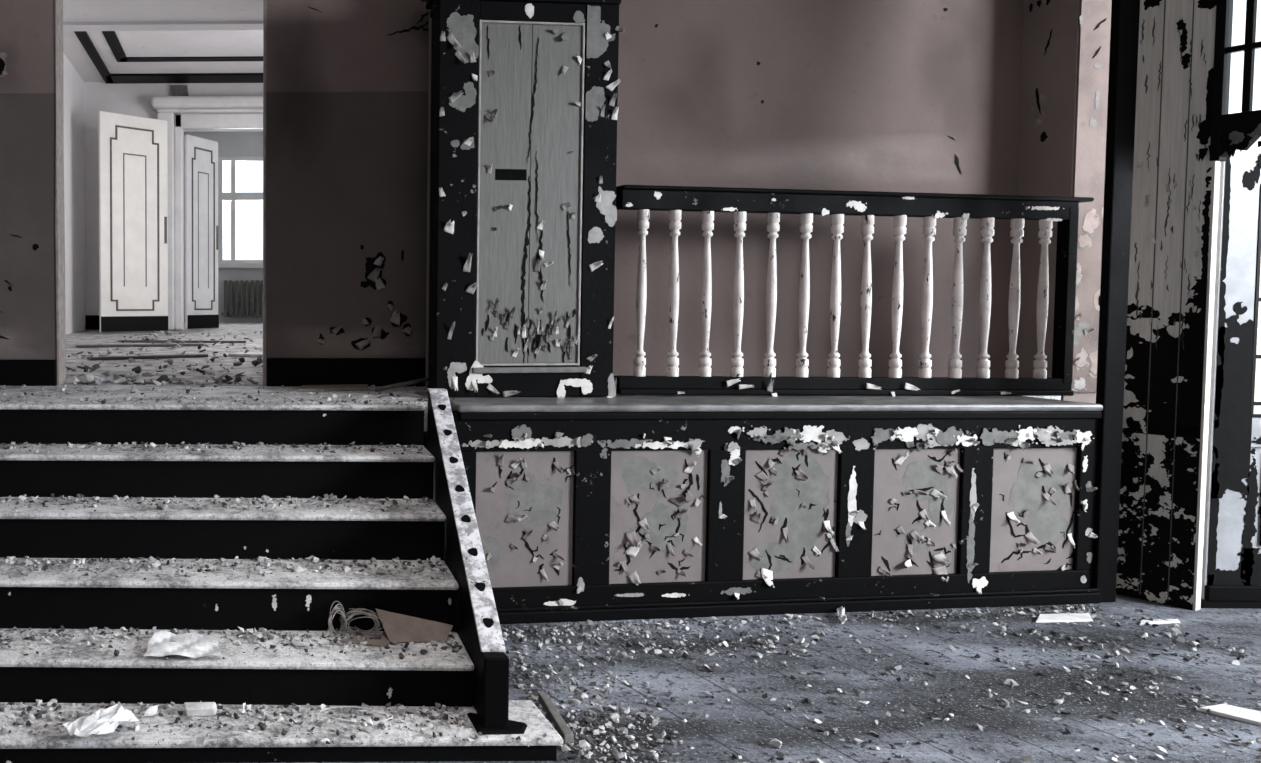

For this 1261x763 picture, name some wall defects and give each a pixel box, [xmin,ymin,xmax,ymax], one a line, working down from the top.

peeling [525,3,534,18]
peeling [439,12,496,116]
peeling [551,5,625,122]
crack [486,25,571,362]
peeling [588,176,633,243]
peeling [846,200,867,212]
peeling [447,361,519,397]
peeling [481,297,598,398]
peeling [1116,67,1261,610]
peeling [462,424,704,597]
peeling [720,423,1098,599]
peeling [544,577,585,606]